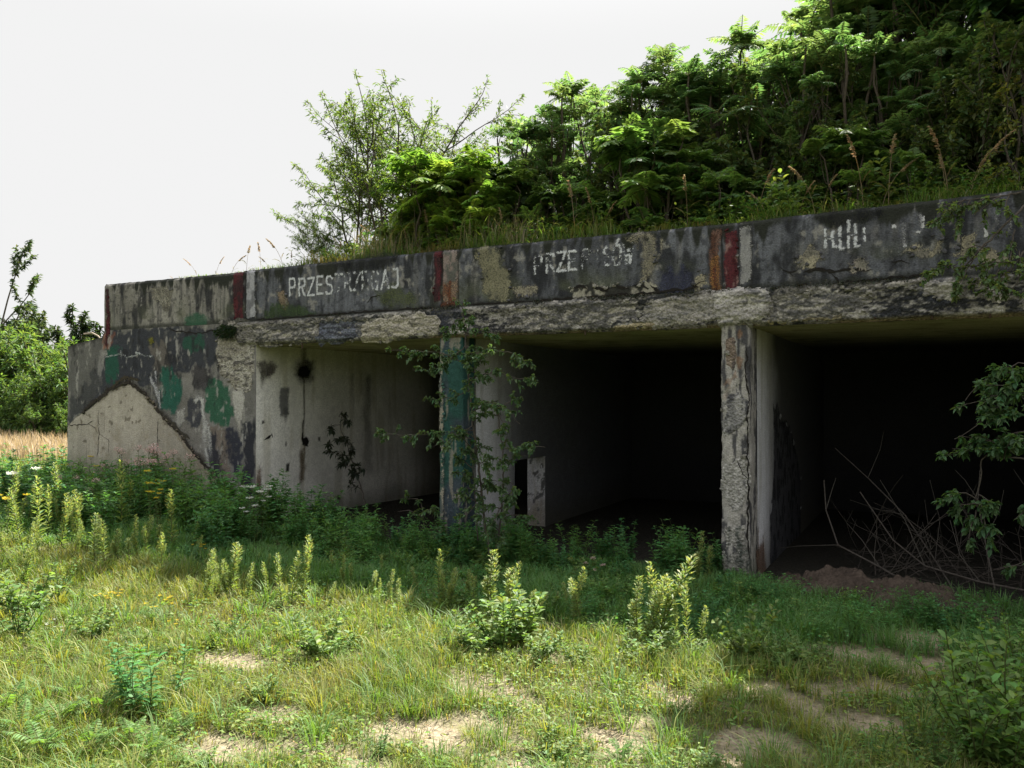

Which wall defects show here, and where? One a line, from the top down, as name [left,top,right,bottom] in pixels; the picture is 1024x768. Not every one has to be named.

spalling [474,226,873,334]
spalling [215,250,459,446]
spalling [720,392,750,438]
crack [737,348,750,559]
spalling [720,454,751,573]